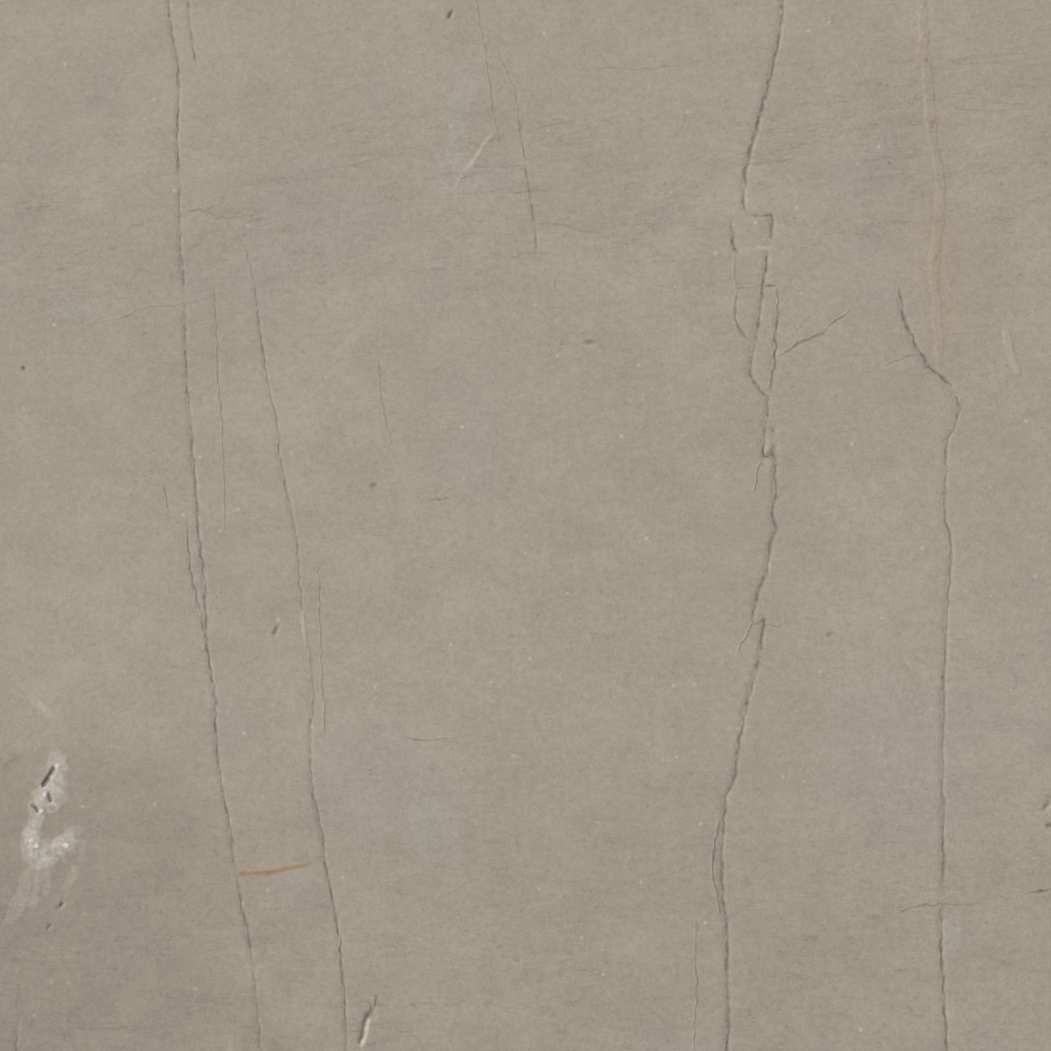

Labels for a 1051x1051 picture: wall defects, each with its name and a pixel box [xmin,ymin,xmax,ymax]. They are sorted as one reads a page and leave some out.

water stain [0,693,300,1051]
crack [161,0,262,1051]
rust [233,861,312,877]
crack [242,243,348,1051]
crack [692,0,849,1051]
crack [885,284,980,1051]